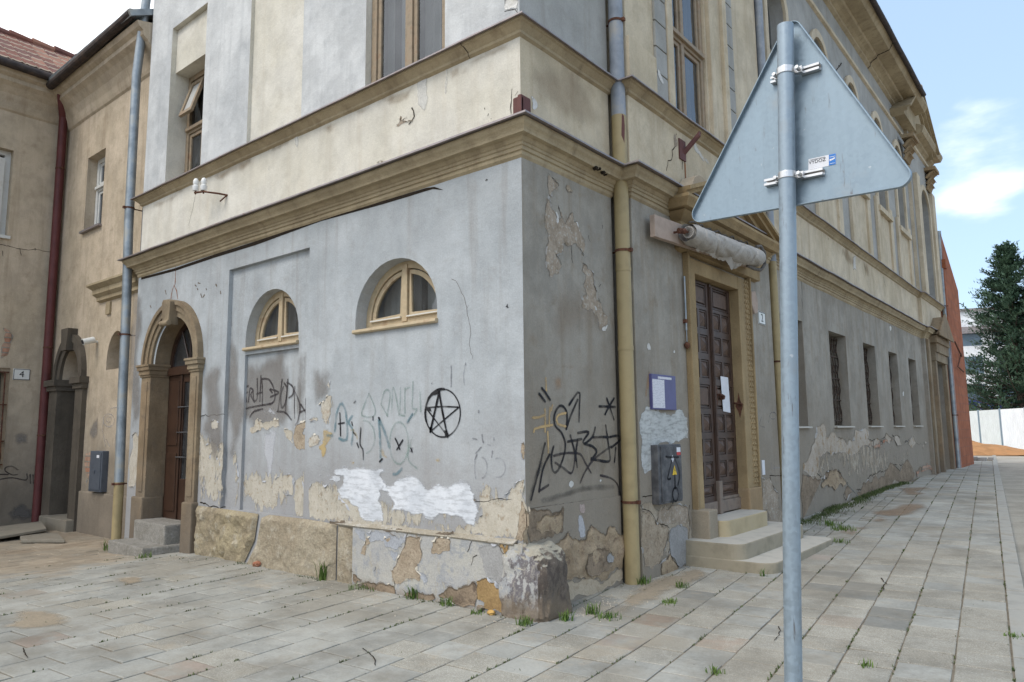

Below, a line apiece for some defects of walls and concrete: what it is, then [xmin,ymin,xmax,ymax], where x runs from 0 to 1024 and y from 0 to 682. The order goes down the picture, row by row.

flaking render [250,380,332,450]
flaking render [198,420,625,612]
flaking render [640,502,692,575]
flaking render [801,423,932,518]